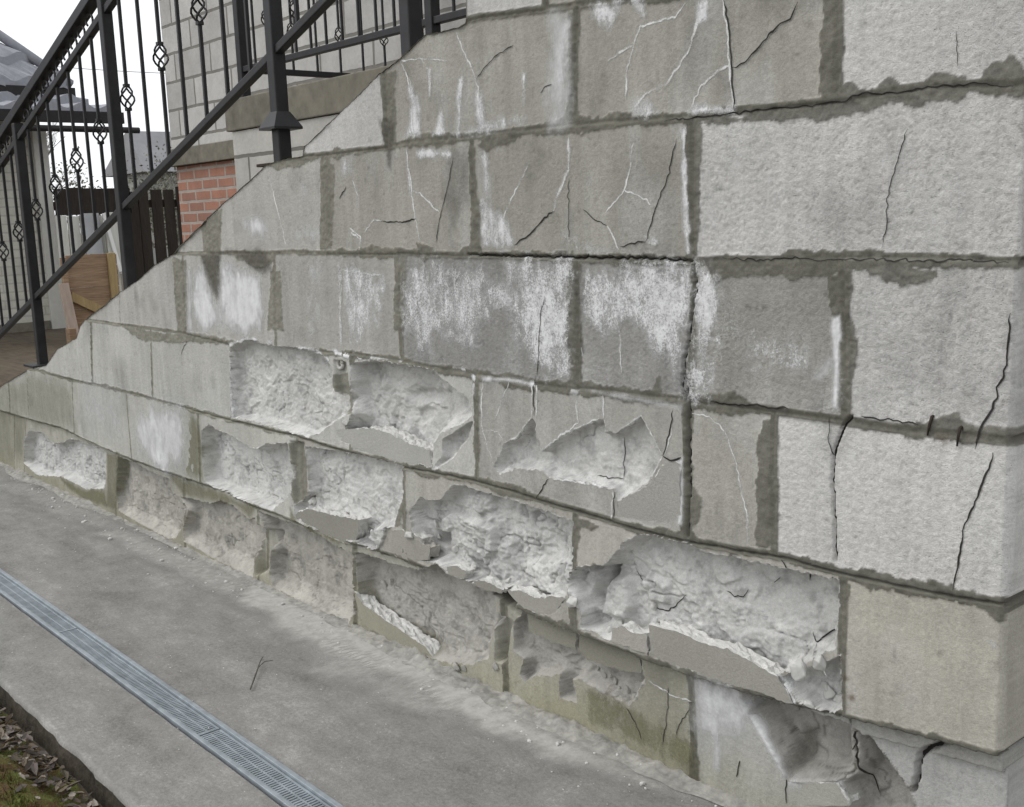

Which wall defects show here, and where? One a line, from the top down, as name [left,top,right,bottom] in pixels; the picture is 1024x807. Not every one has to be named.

crack [400,32,513,95]
water stain [188,250,272,346]
water stain [402,127,723,405]
crack [470,0,1014,556]
spalling [23,340,919,807]
crack [953,315,1011,587]